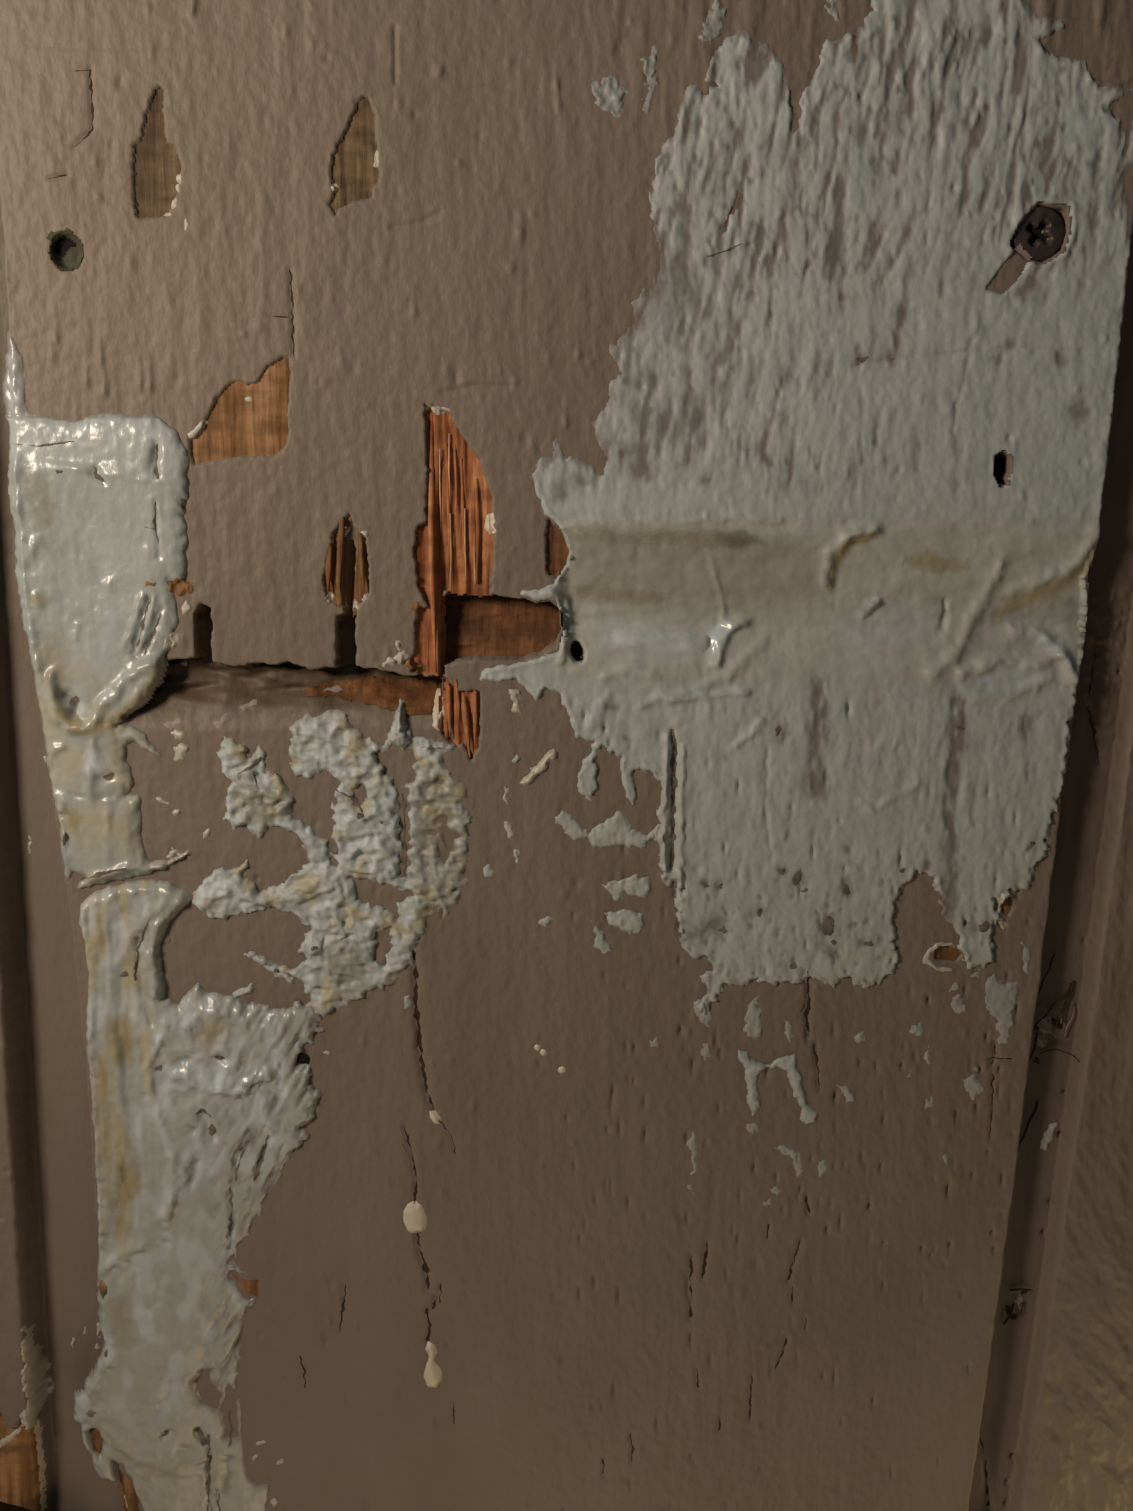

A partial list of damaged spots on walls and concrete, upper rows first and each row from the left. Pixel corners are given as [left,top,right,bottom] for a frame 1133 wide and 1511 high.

peeling [591,45,659,118]
peeling [133,87,188,231]
peeling [329,97,379,215]
peeling [188,357,291,463]
peeling [546,519,569,577]
peeling [391,688,460,751]
peeling [503,749,558,863]
peeling [555,810,665,848]
peeling [590,874,652,954]
peeling [923,941,1031,1044]
crack [402,949,456,1341]
peeling [0,1414,47,1511]